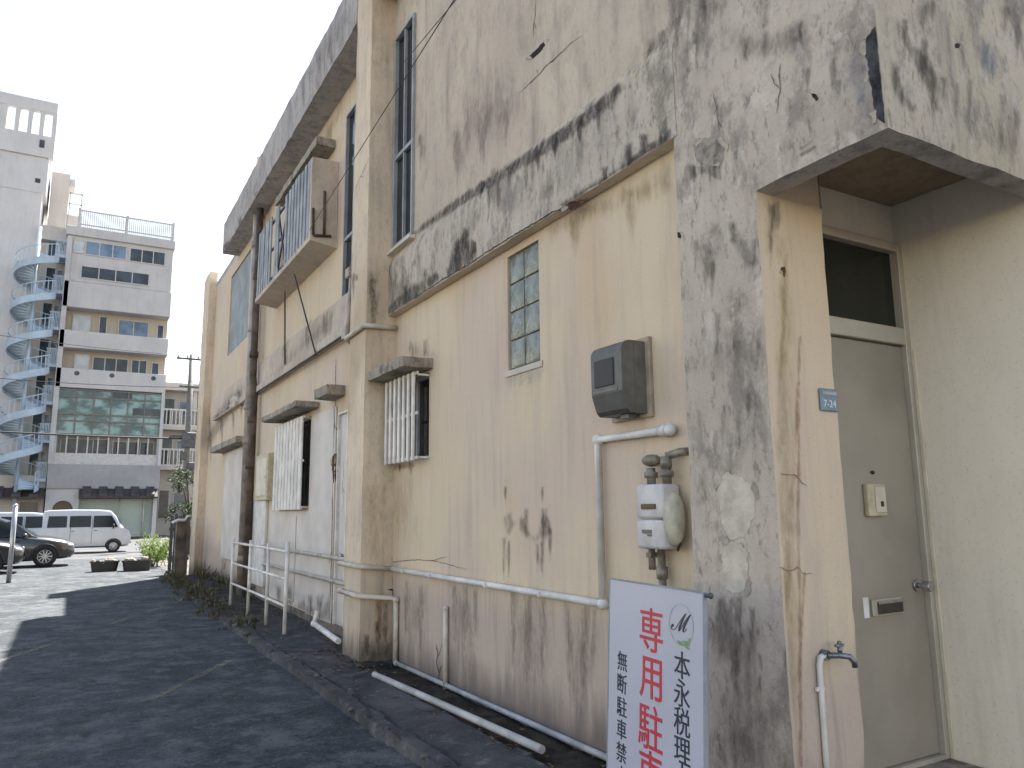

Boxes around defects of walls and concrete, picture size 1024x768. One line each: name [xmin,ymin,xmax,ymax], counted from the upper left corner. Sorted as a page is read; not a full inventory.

spalling [859,27,885,125]
leakage [422,85,621,229]
leakage [562,131,669,206]
leakage [389,230,476,314]
crack [387,557,459,595]
peeling [713,472,759,596]